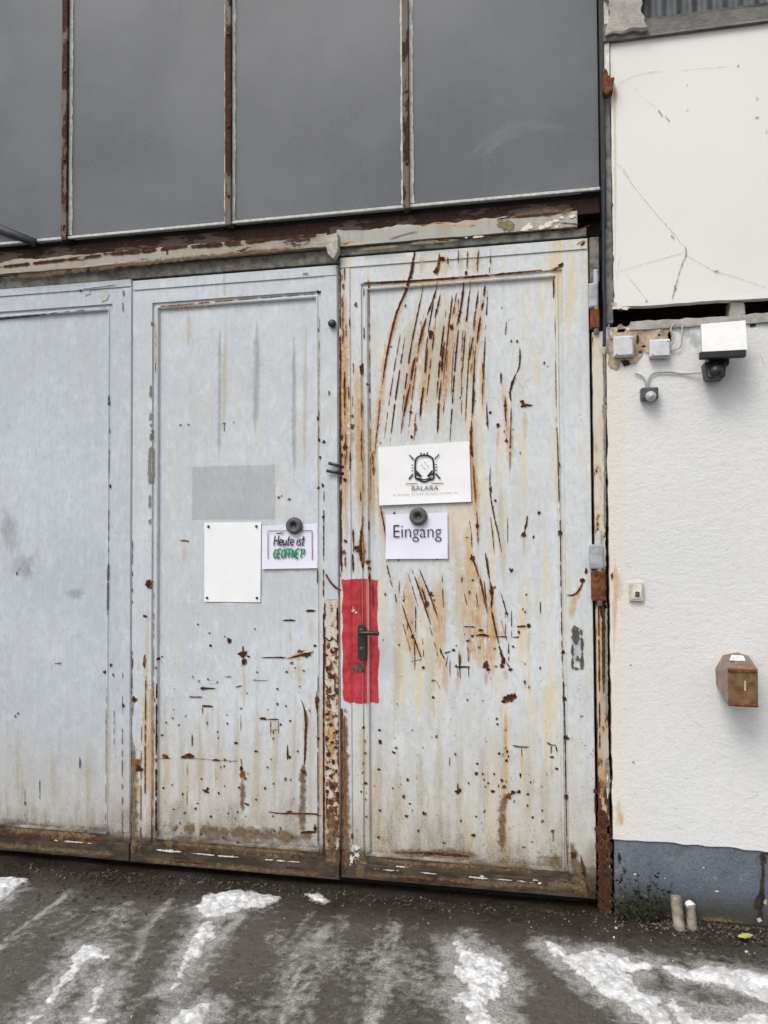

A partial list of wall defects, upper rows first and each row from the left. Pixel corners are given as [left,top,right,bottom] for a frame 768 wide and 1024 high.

peeling [359,214,576,251]
crack [671,235,687,299]
spalling [744,301,768,315]
corrosion [339,249,564,679]
spalling [601,302,728,528]
corrosion [130,608,345,876]
peeling [513,427,584,866]
corrosion [598,569,613,748]
corrosion [0,832,113,856]
corrosion [366,779,613,911]